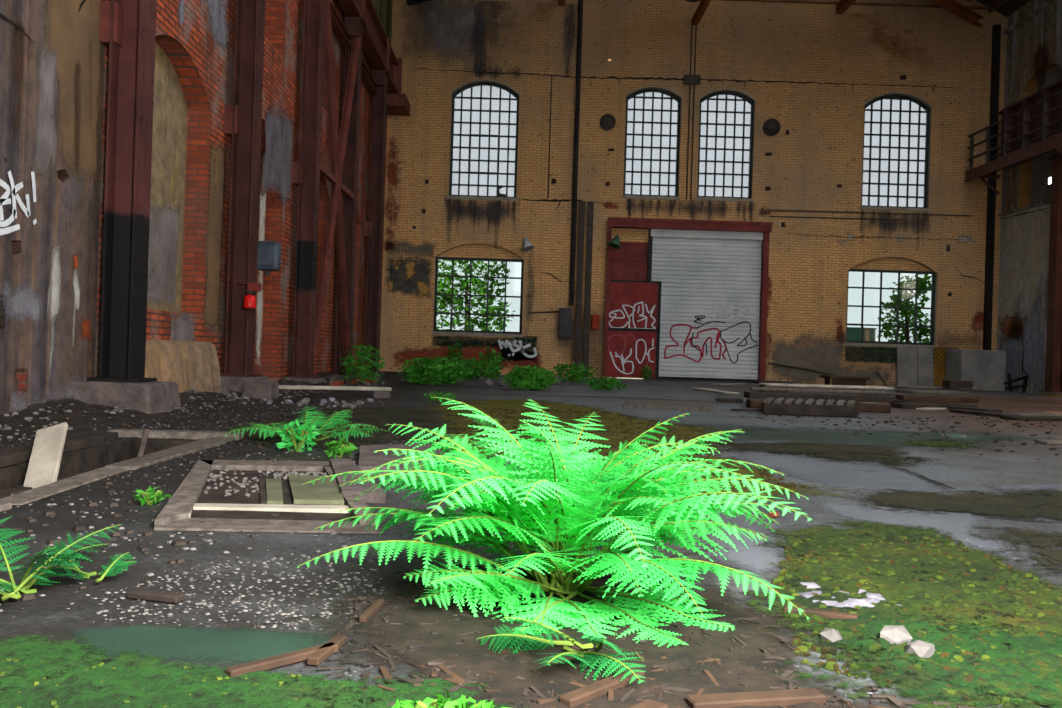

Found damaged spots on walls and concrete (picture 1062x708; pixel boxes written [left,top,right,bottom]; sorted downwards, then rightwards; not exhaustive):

peeling [200,0,229,47]
leakage [427,1,498,77]
peeling [259,110,293,241]
leakage [447,200,515,225]
leakage [628,198,753,216]
leakage [862,213,929,231]